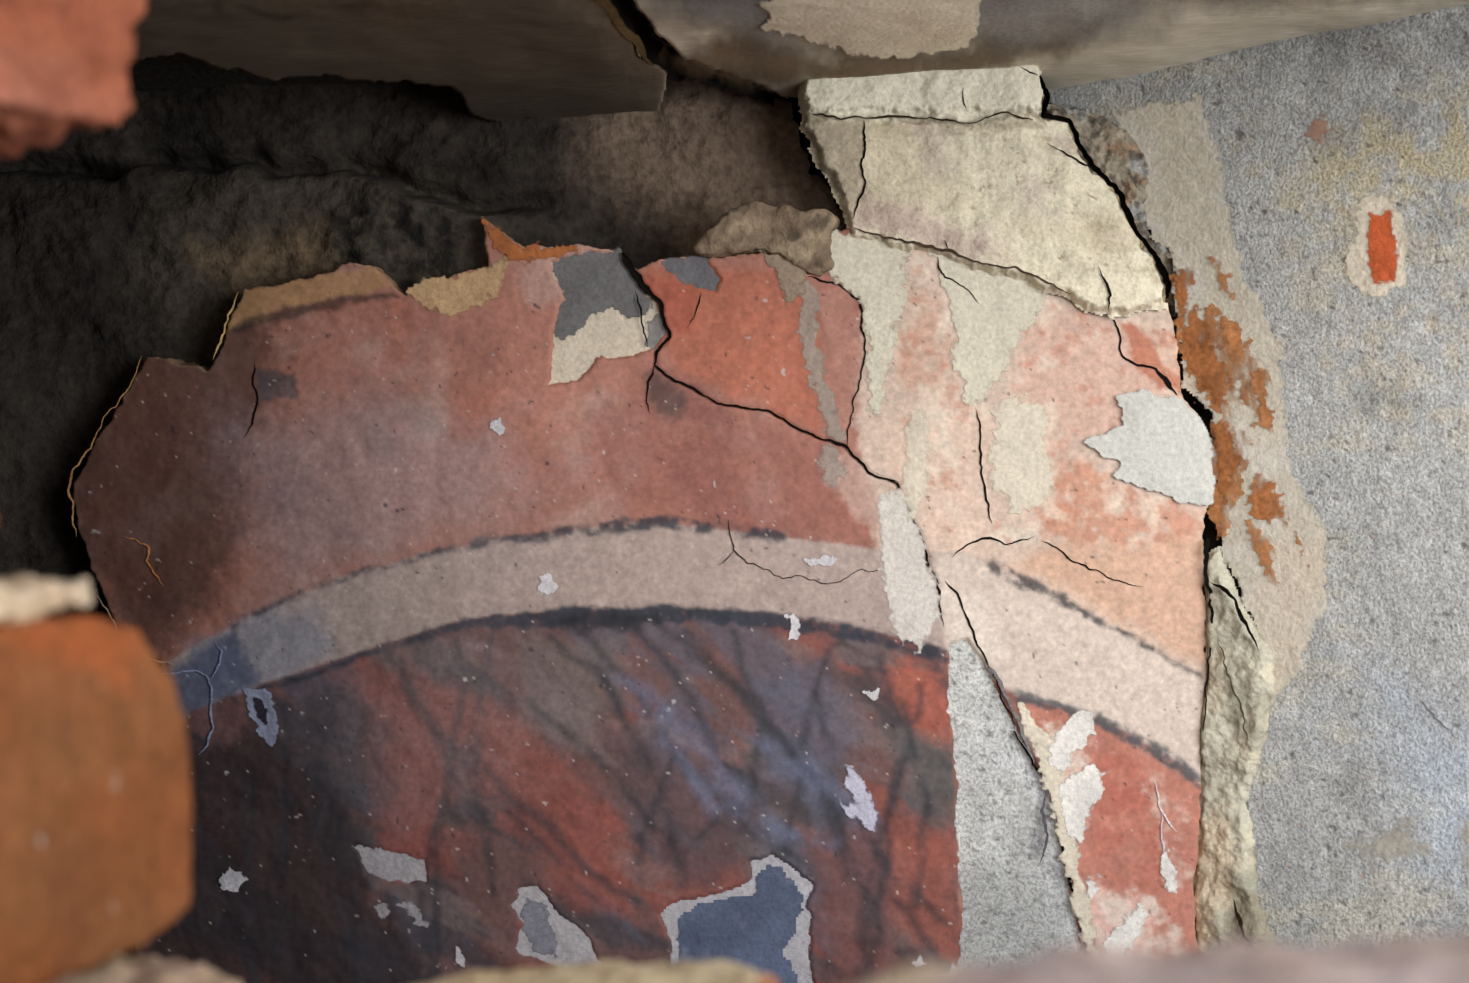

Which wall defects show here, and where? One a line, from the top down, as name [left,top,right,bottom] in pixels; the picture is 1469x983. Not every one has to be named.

leakage [661,0,1156,84]
crack [595,0,1172,301]
flaking render [406,216,668,385]
flaking render [661,256,721,291]
flaking render [759,0,1329,714]
crack [1098,266,1177,395]
corrosion [1169,256,1310,584]
crack [621,252,1142,944]
flaking render [946,640,1149,966]
flaking render [511,886,599,966]
flaking render [661,855,814,983]